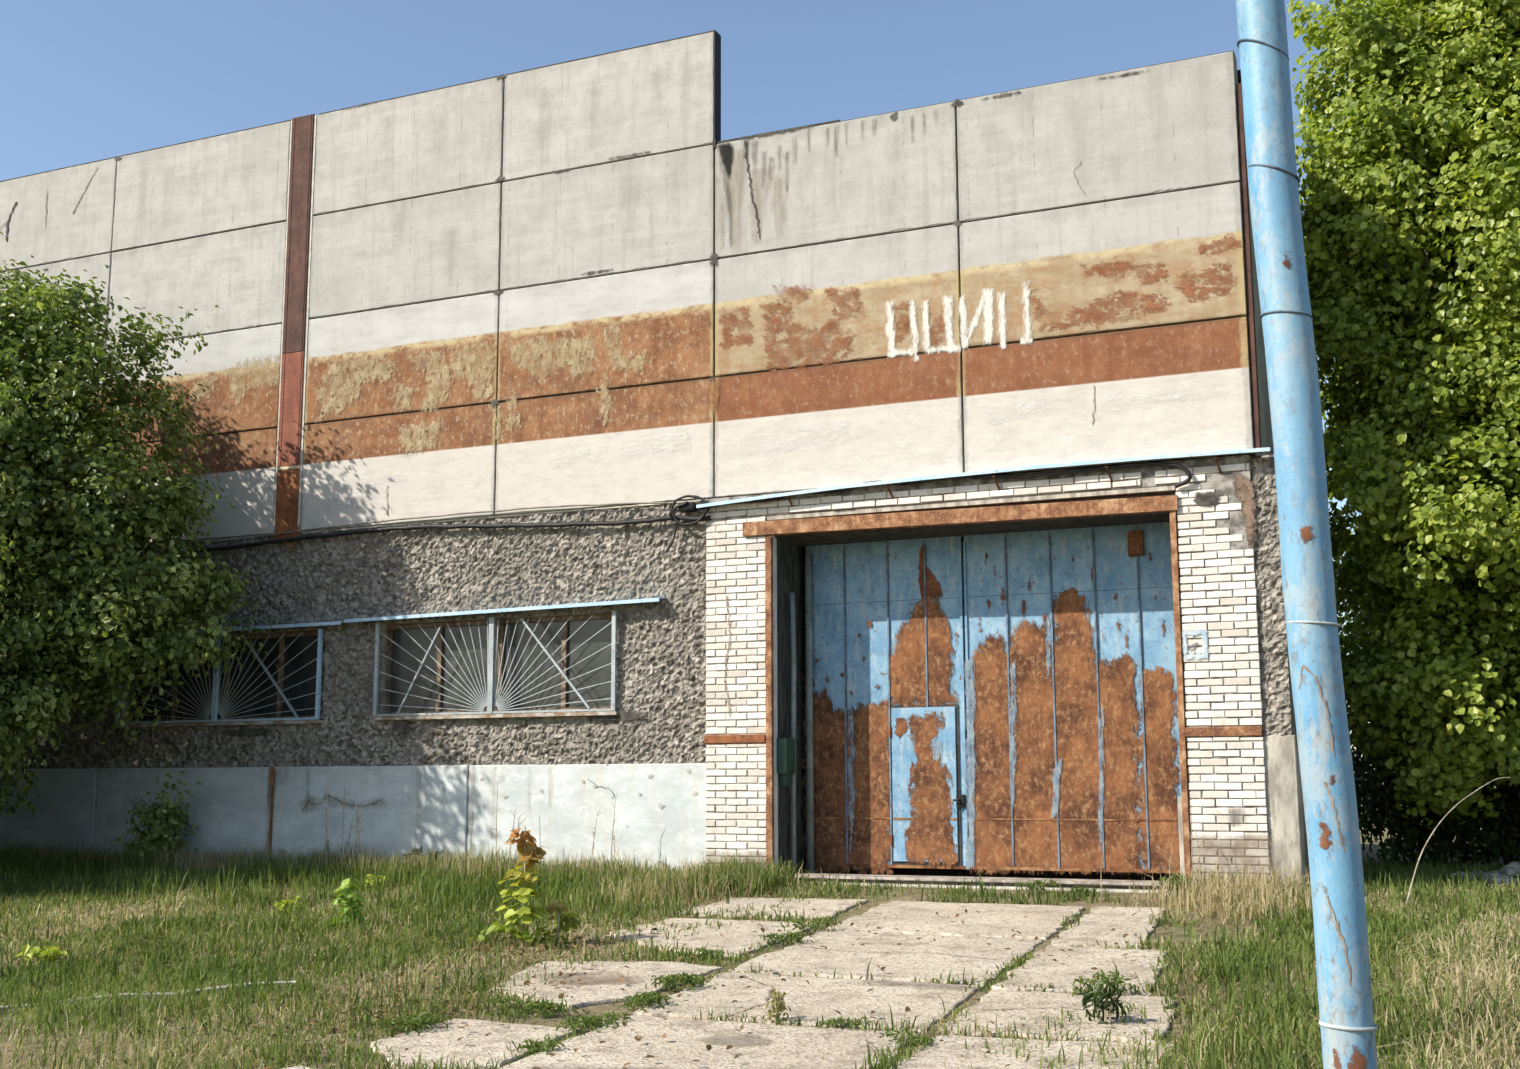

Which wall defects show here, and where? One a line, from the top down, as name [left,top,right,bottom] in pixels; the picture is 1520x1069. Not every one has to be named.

damp [717,140,760,239]
corrosion [1300,525,1313,543]
corrosion [267,767,275,853]
corrosion [1318,822,1332,850]
corrosion [1333,1045,1368,1069]